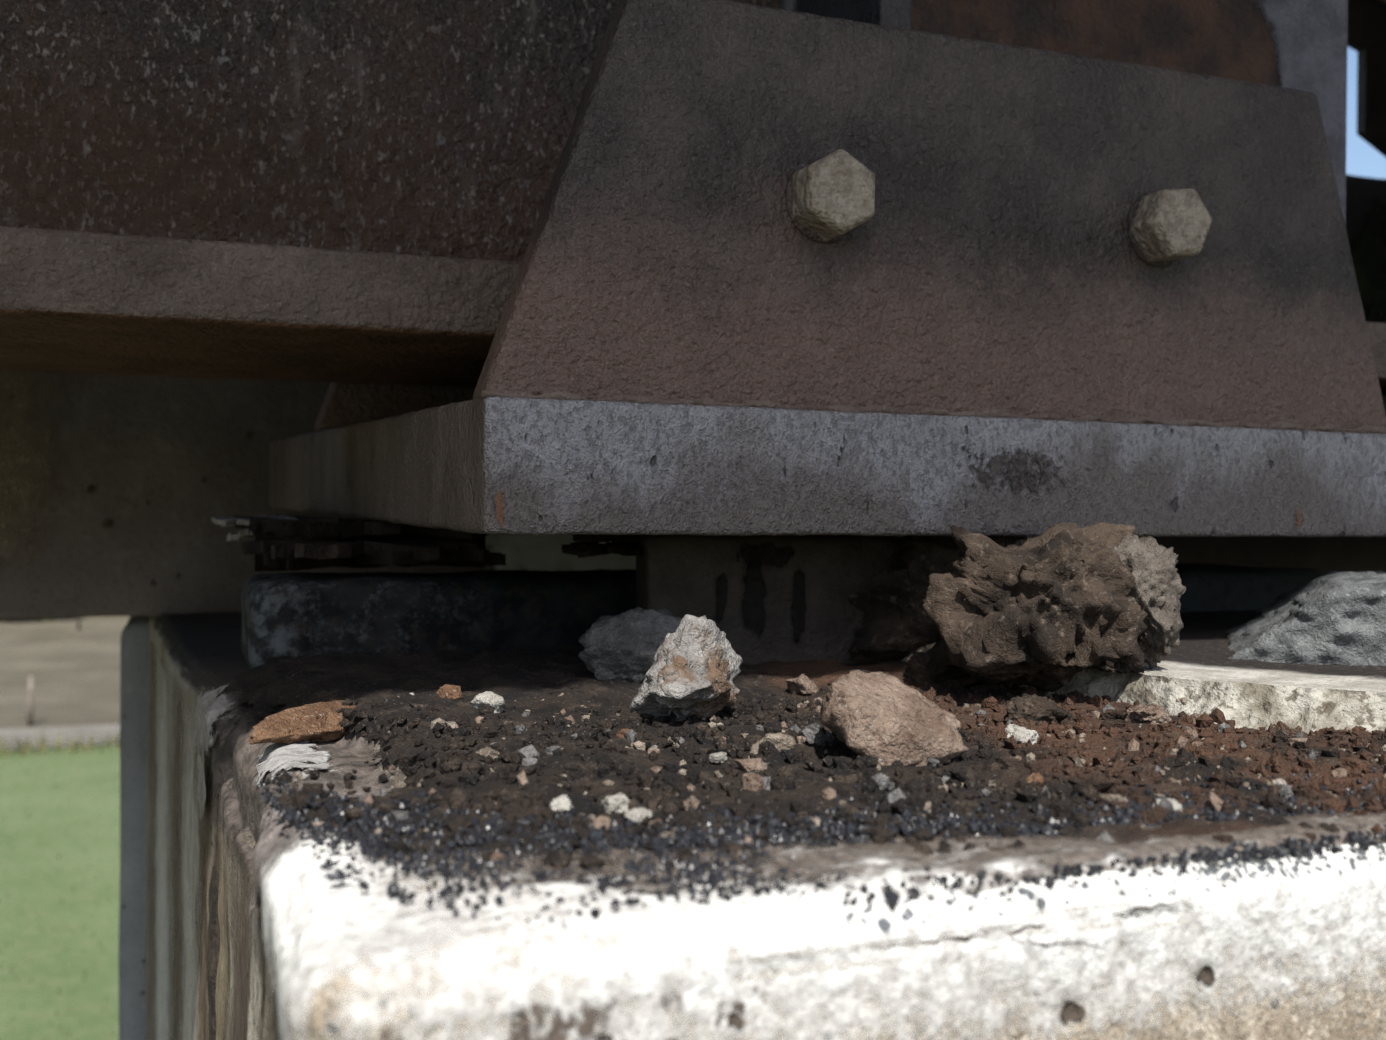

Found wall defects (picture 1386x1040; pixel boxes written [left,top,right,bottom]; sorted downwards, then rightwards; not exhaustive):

leakage [155,670,200,1040]
leakage [247,874,281,1040]